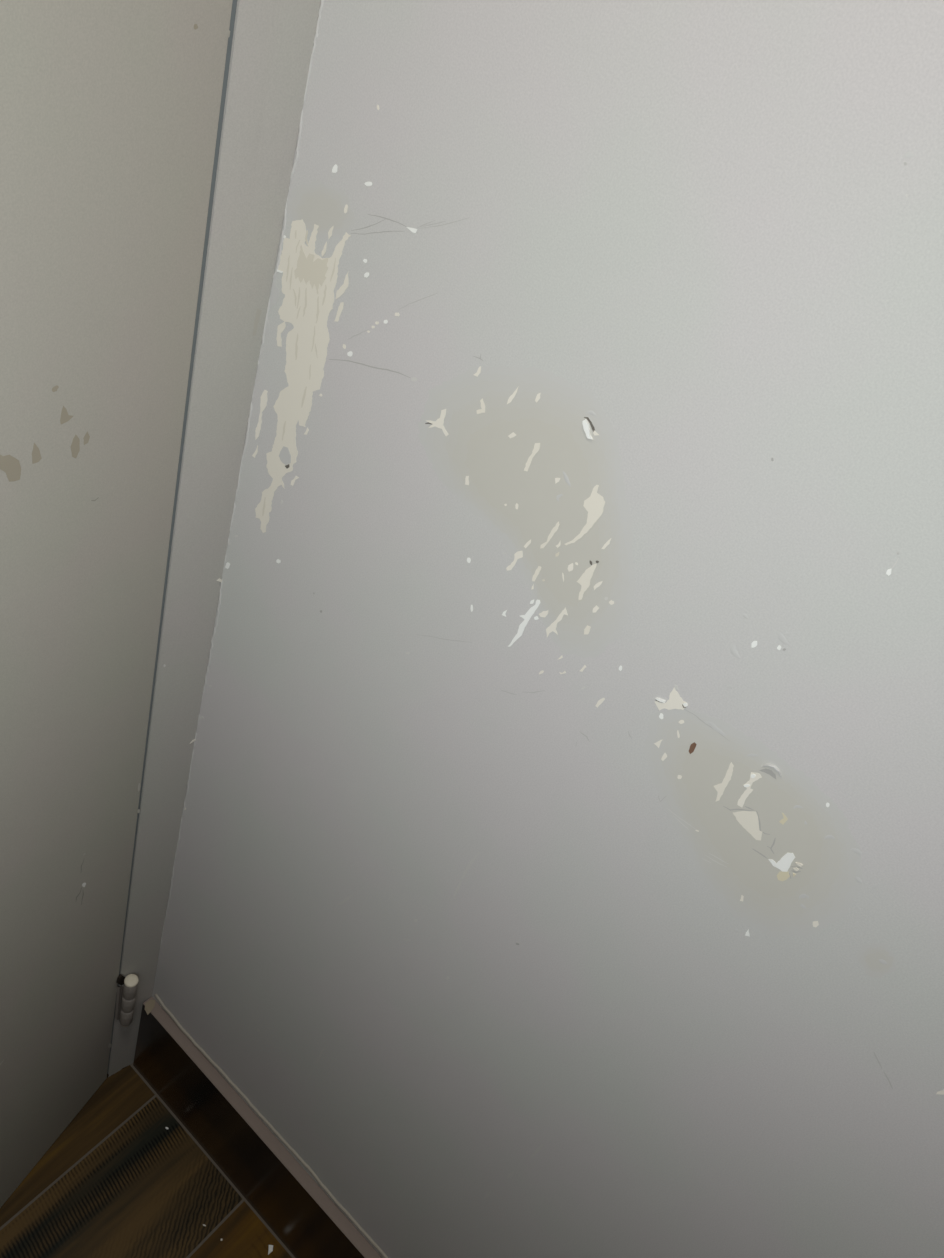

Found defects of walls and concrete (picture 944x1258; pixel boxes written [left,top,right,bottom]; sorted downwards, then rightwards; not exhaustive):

peeling [252,220,353,533]
peeling [425,409,449,436]
peeling [582,419,599,440]
peeling [506,485,614,635]
peeling [502,566,568,647]
peeling [654,688,688,738]
peeling [714,762,762,840]
peeling [768,853,803,881]